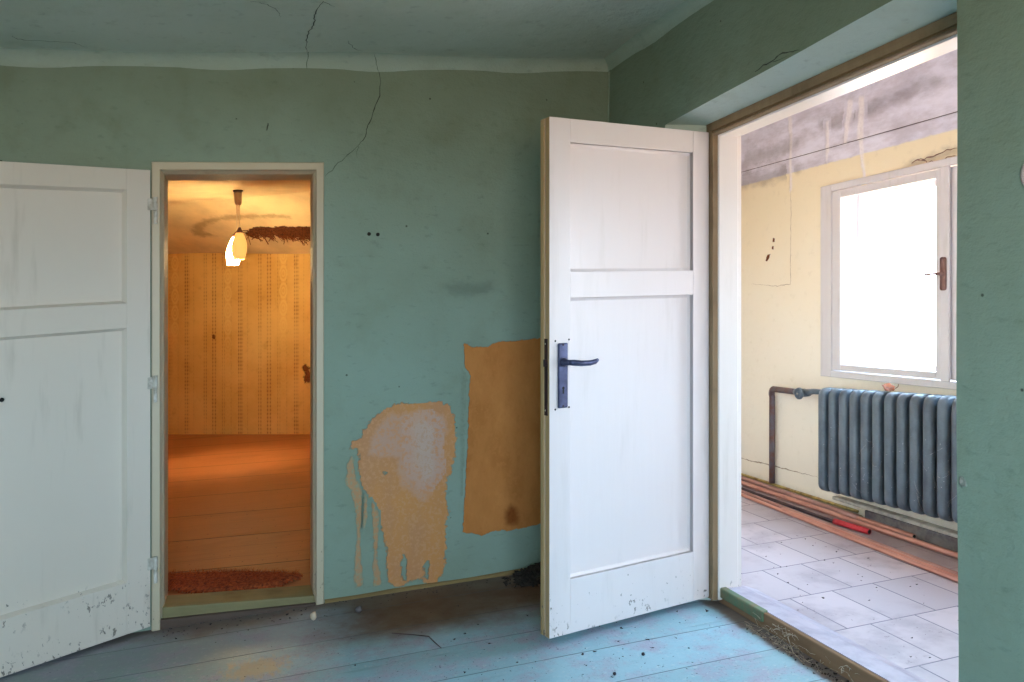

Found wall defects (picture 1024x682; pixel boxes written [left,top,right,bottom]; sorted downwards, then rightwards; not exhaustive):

crack [305,1,330,67]
crack [326,41,381,175]
leakage [823,90,870,186]
peeling [343,335,541,590]